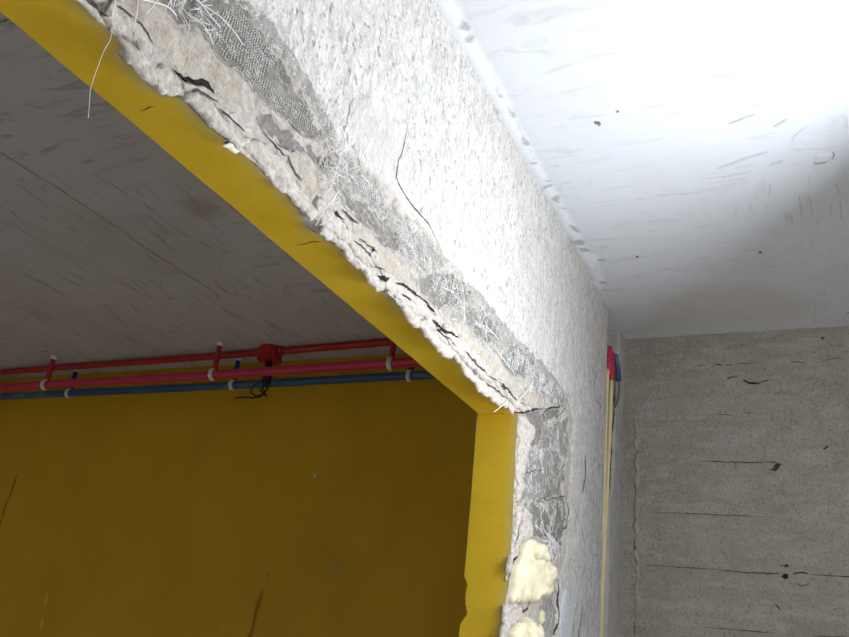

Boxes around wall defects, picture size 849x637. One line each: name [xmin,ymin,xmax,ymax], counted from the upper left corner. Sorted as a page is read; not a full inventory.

crack [396,123,441,248]
spalling [76,0,570,581]
crack [701,458,779,466]
flaking render [499,603,523,637]
spalling [539,579,558,637]
crack [633,468,849,634]